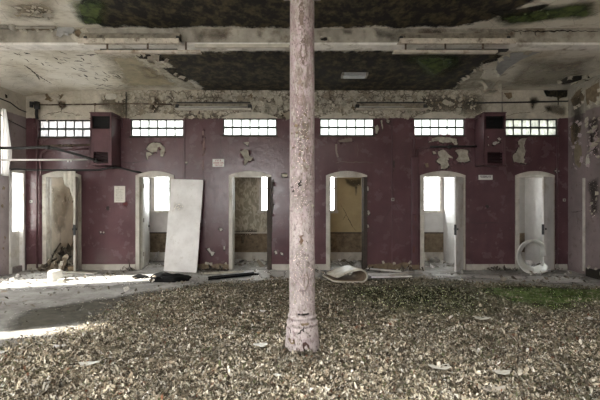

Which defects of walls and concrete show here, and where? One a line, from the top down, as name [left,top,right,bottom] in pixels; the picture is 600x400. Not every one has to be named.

damp [111,51,290,90]
damp [314,51,502,90]
peeling [315,51,542,116]
peeling [557,74,600,109]
peeling [423,134,472,171]
peeling [511,137,529,166]
peeling [569,117,600,167]
peeling [127,54,314,303]
damp [54,192,68,229]
peeling [588,180,599,218]